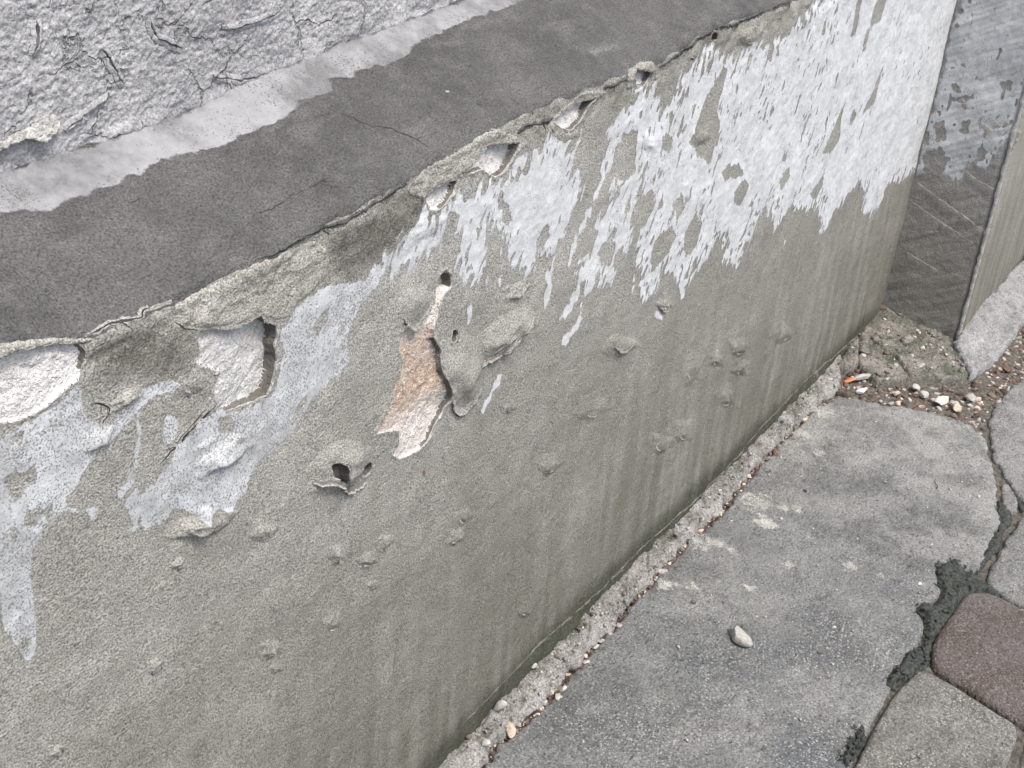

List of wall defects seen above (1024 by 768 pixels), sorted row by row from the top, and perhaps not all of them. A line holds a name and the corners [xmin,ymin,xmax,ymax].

crack [28,19,43,56]
crack [146,17,183,53]
crack [220,7,281,35]
crack [659,0,790,68]
crack [62,46,129,133]
crack [213,71,257,90]
crack [603,74,629,91]
crack [490,117,553,146]
peeling [559,0,1024,346]
crack [255,183,408,261]
crack [84,300,199,337]
peeling [0,90,606,661]